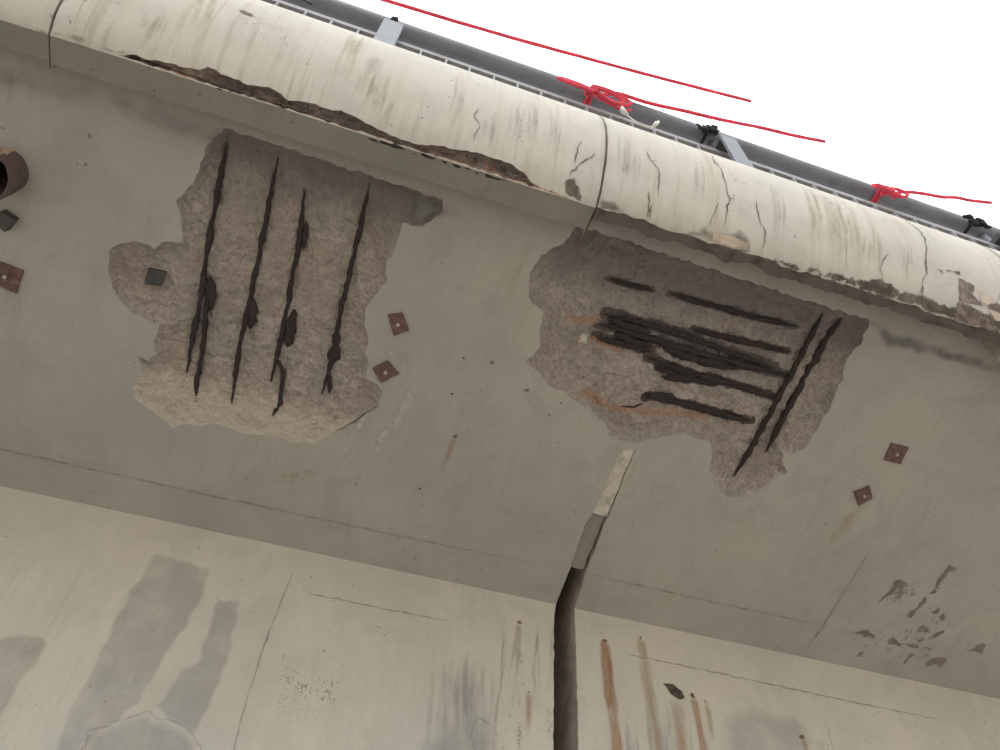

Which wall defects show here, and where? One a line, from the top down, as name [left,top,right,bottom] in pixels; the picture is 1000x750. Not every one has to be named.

spalling [119,54,568,198]
crack [709,156,766,253]
spalling [108,128,443,444]
crack [905,219,928,299]
peeling [939,269,1000,333]
spalling [525,226,869,497]
peeling [856,566,956,667]
rust [602,639,621,750]
rust [690,693,706,750]